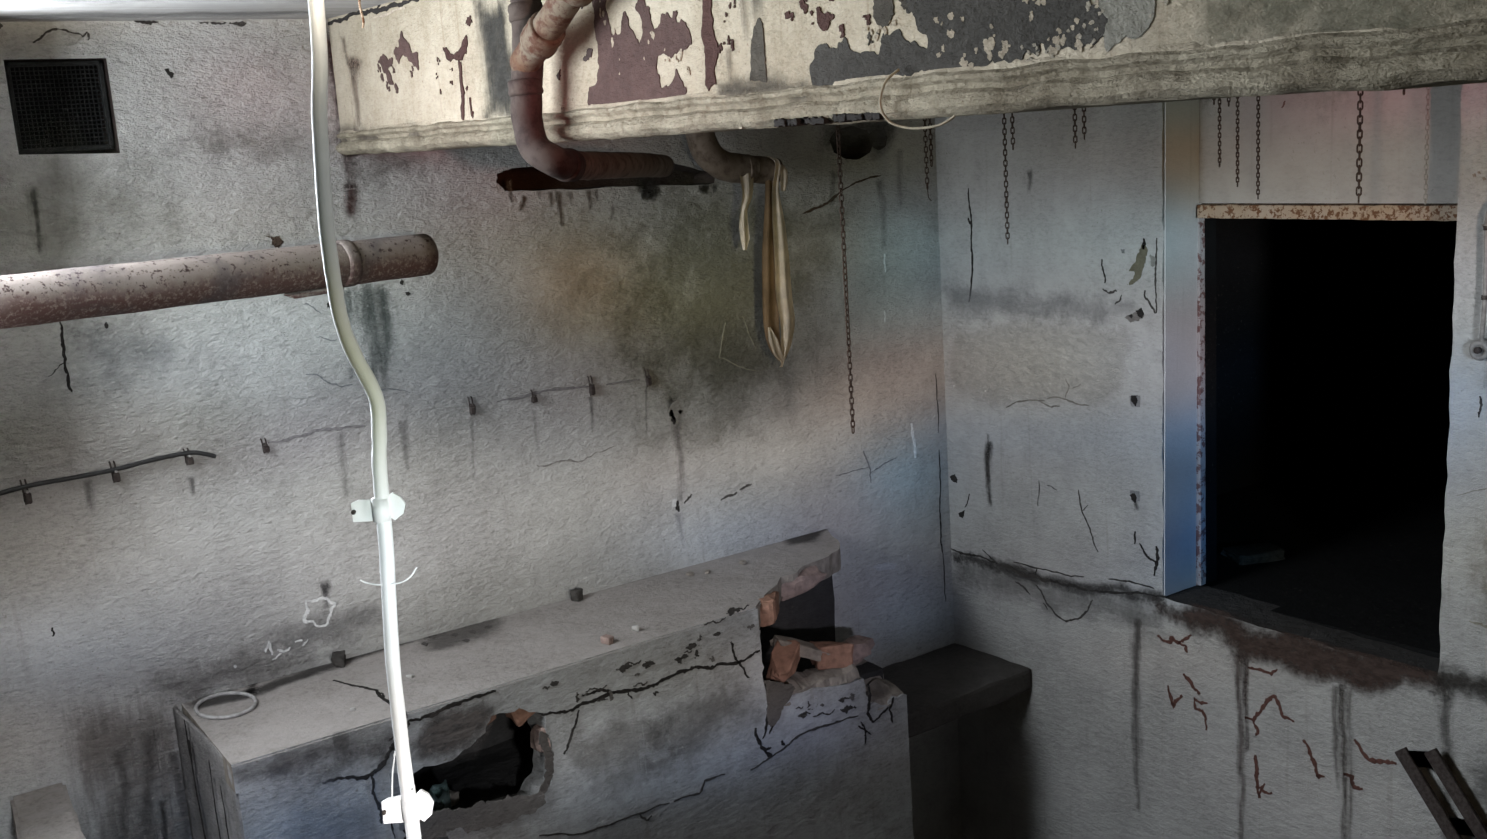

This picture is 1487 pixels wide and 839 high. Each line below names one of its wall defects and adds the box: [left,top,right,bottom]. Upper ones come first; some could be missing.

peeling [581,0,767,105]
peeling [784,0,1169,86]
corrosion [284,287,344,299]
crack [48,322,73,392]
crack [908,374,1208,730]
spalling [389,773,401,796]
crack [322,680,496,839]
spalling [399,731,554,839]
crack [539,641,894,836]
spalling [764,637,871,732]
damp [1236,656,1249,807]
crack [1244,666,1397,798]